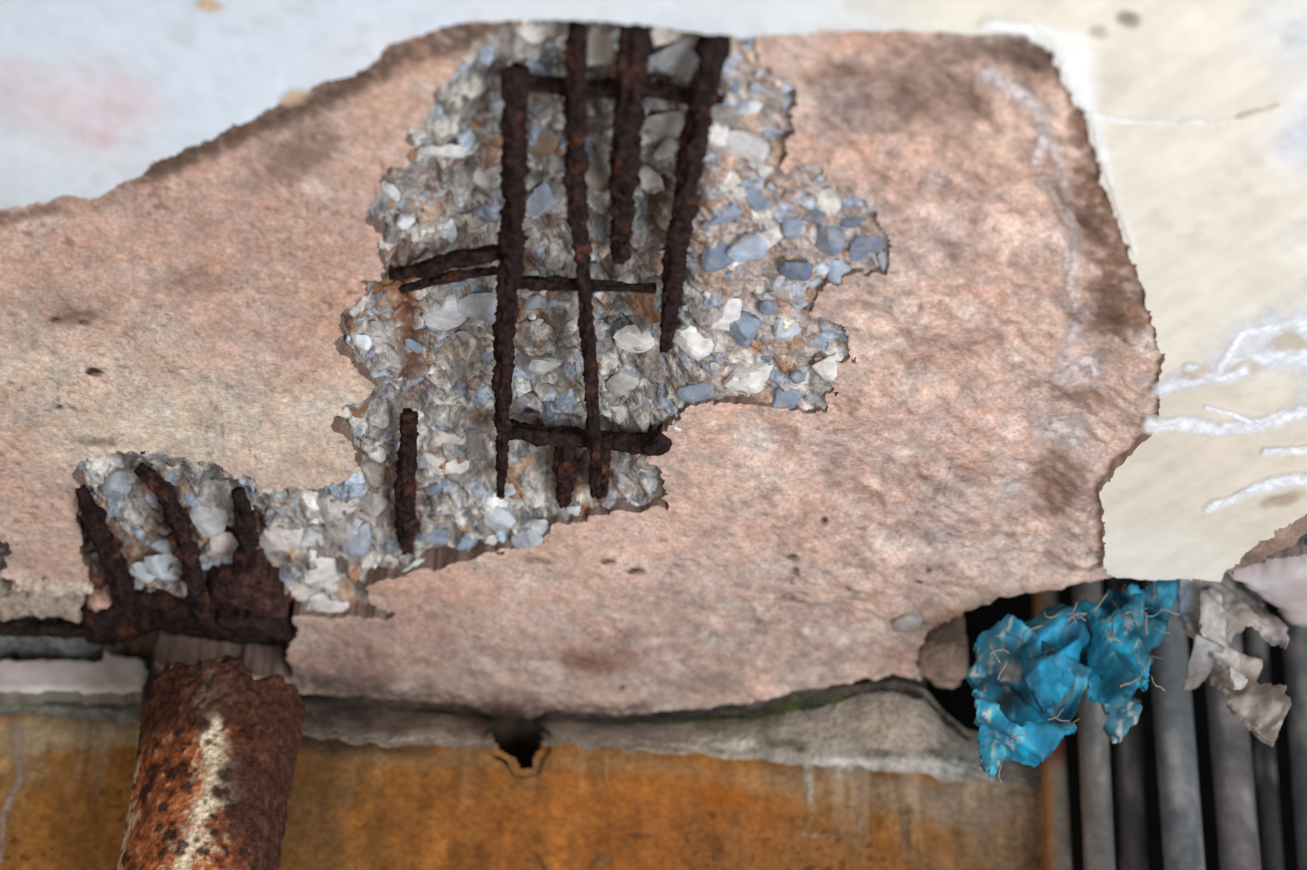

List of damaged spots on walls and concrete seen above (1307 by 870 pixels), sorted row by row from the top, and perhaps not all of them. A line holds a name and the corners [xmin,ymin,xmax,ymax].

corrosion [375,21,732,509]
corrosion [0,462,294,646]
corrosion [394,408,420,555]
spalling [0,20,1164,778]
water stain [1144,405,1307,437]
water stain [1182,316,1307,383]
water stain [1204,474,1307,513]
water stain [1262,445,1307,455]